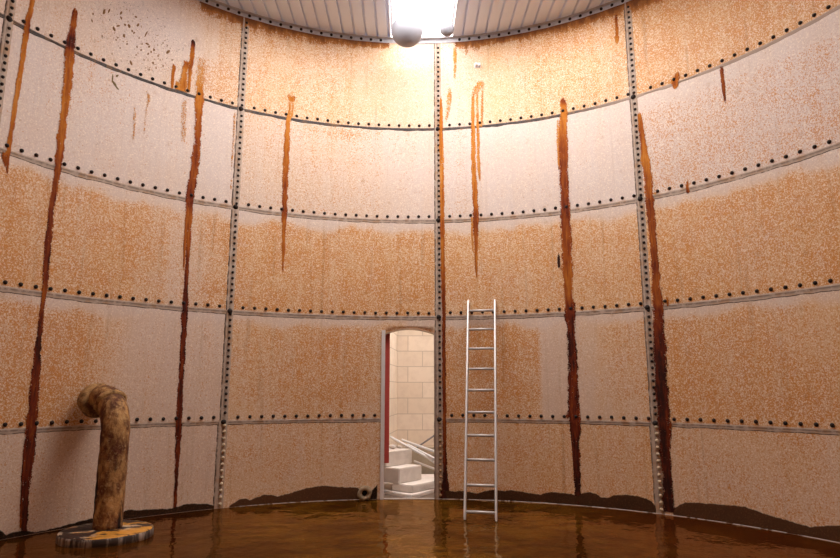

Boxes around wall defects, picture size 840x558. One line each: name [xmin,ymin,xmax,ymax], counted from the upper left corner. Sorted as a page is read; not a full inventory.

rust [2,0,35,174]
rust [20,8,78,531]
rust [171,39,206,508]
rust [281,94,296,273]
rust [439,88,452,498]
rust [470,80,484,277]
rust [556,97,582,505]
rust [637,112,675,512]